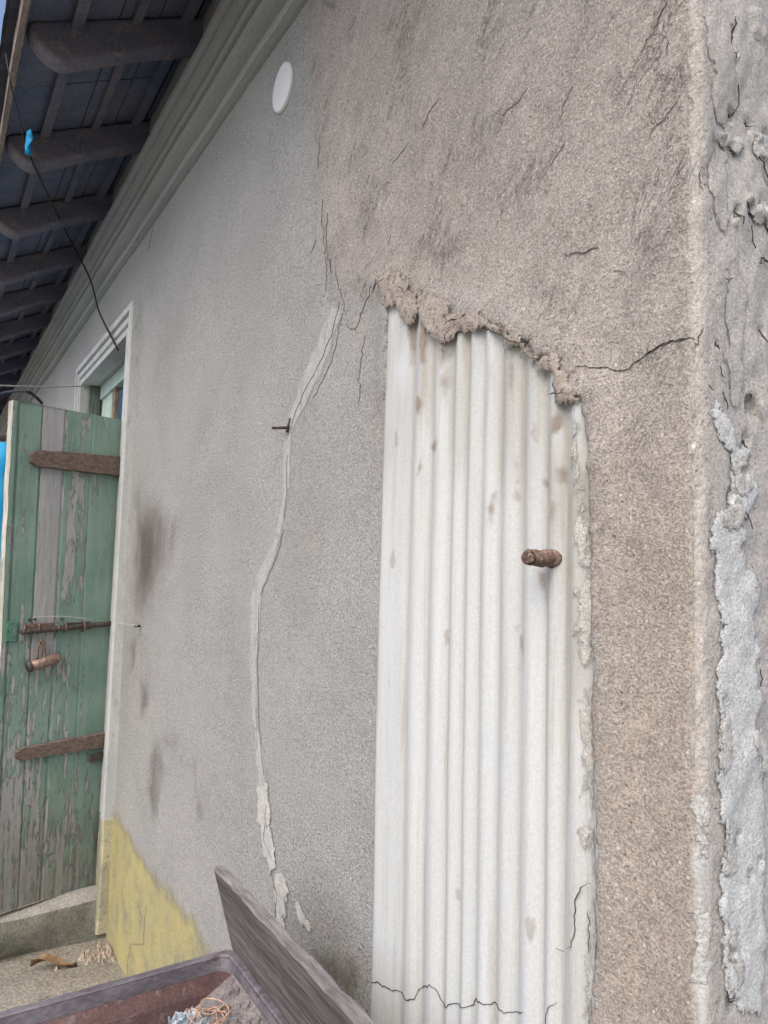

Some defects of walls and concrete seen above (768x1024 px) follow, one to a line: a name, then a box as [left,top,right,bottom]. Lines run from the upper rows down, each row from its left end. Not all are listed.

spalling [714,122,768,178]
spalling [733,196,768,264]
crack [574,329,729,409]
spalling [374,267,594,668]
crack [250,201,376,932]
peeling [686,398,768,1024]
spalling [577,684,595,874]
crack [372,981,556,1024]
crack [556,883,591,953]
spalling [583,899,597,1018]